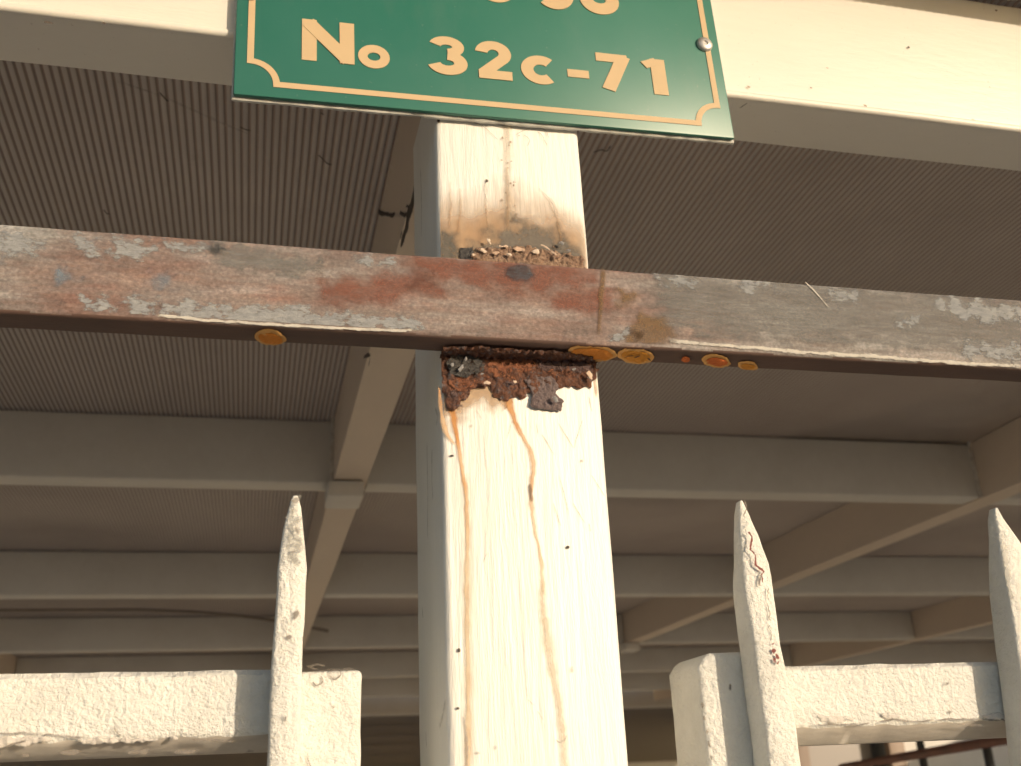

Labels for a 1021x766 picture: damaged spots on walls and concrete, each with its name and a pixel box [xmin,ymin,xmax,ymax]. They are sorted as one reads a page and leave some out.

crack [378,188,414,247]
peeling [71,231,322,278]
peeling [78,293,425,332]
rust [255,329,286,346]
peeling [654,273,1021,368]
rust [439,313,671,766]
spalling [0,727,158,757]